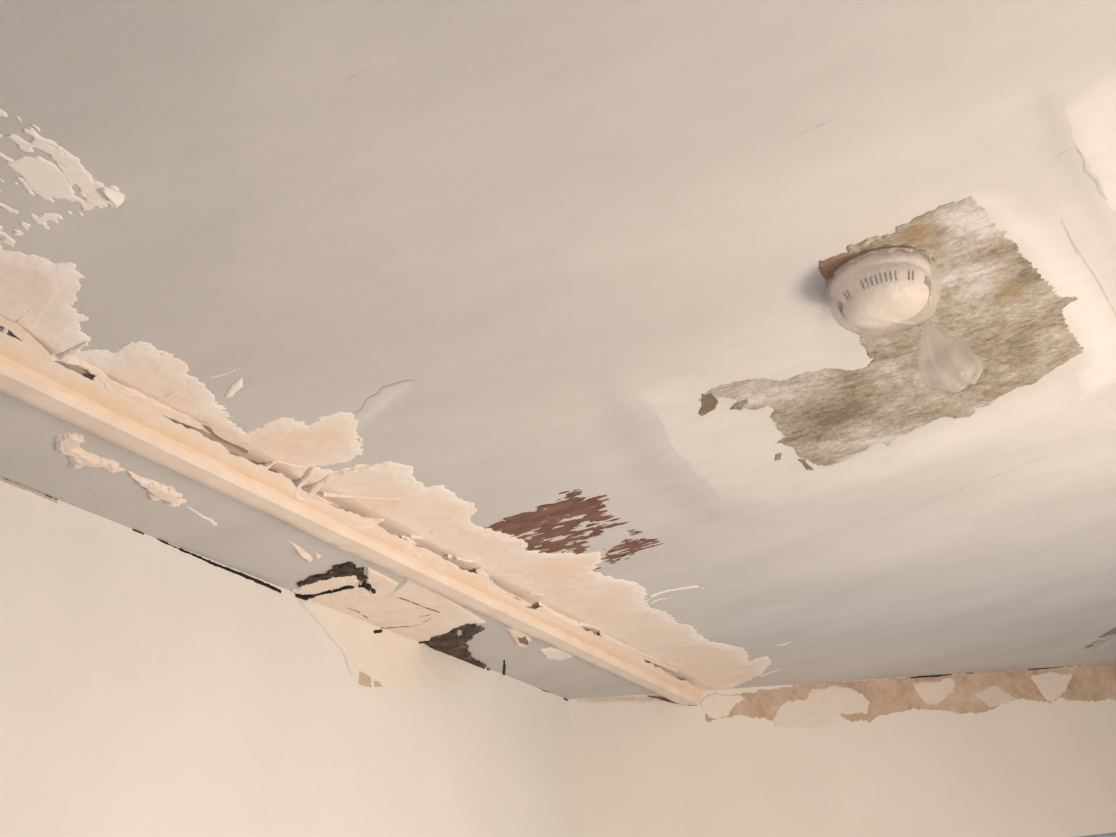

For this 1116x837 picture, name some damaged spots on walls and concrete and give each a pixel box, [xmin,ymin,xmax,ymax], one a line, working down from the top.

peeling [698,196,1084,470]
spalling [0,477,58,503]
peeling [128,471,187,507]
peeling [484,489,664,572]
spalling [291,561,369,595]
spalling [419,623,491,671]